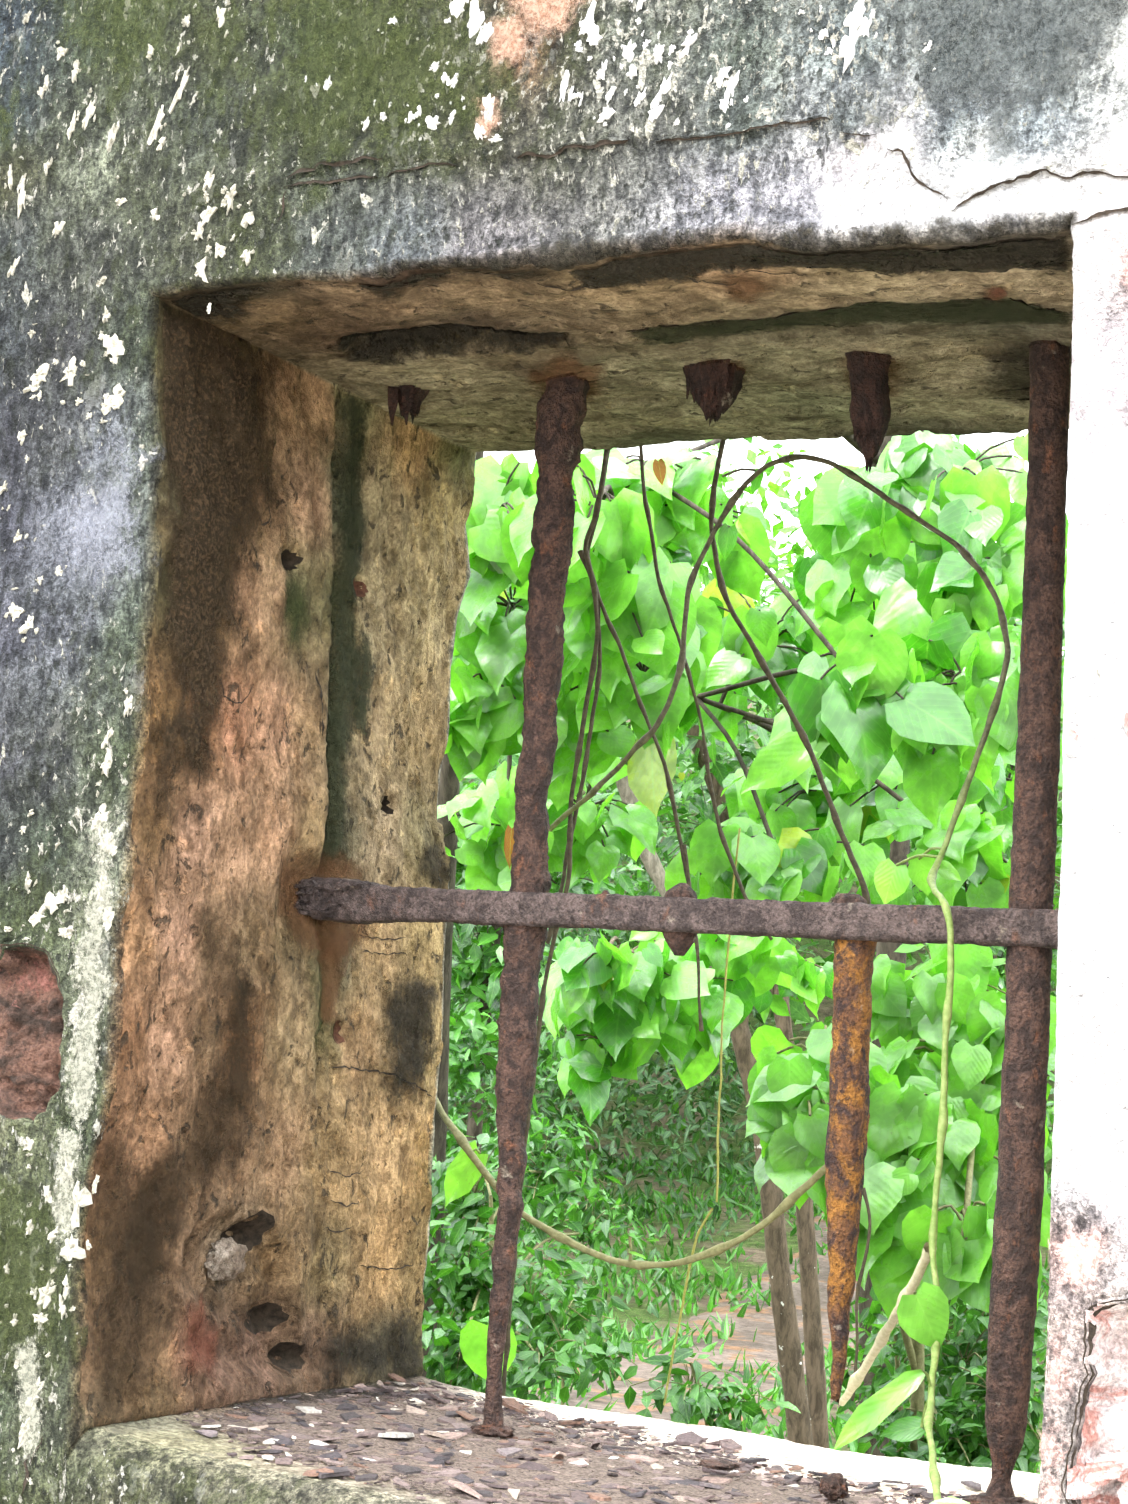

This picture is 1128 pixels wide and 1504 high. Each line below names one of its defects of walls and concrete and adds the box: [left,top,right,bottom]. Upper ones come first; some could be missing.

crack [517,114,1128,225]
damp [337,270,542,299]
corrosion [986,342,1057,403]
peeling [4,587,39,643]
damp [148,282,317,834]
peeling [91,687,135,933]
spalling [0,853,75,1169]
corrosion [279,854,369,1020]
mould [382,971,439,1102]
peeling [0,1159,100,1331]
peeling [12,1376,45,1453]
spalling [1039,1227,1128,1504]